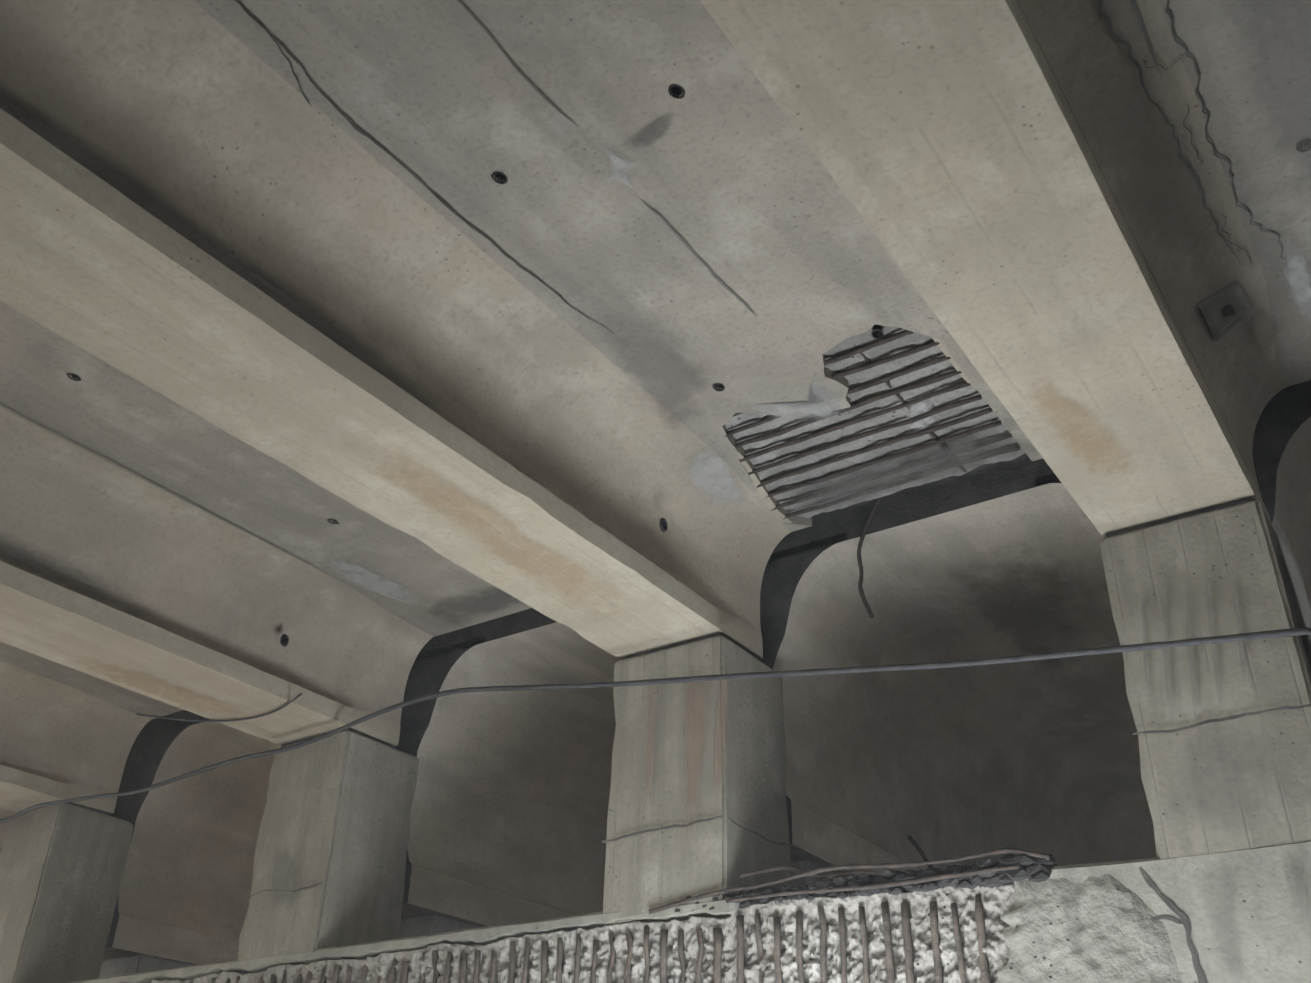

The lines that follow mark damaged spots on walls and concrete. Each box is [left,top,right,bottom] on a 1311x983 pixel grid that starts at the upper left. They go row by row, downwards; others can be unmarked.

crack [234,0,613,334]
crack [1098,0,1290,288]
crack [639,199,756,316]
spalling [725,325,1025,618]
crack [1132,704,1311,735]
crack [602,815,798,849]
spalling [151,835,1057,983]
crack [1139,867,1207,983]